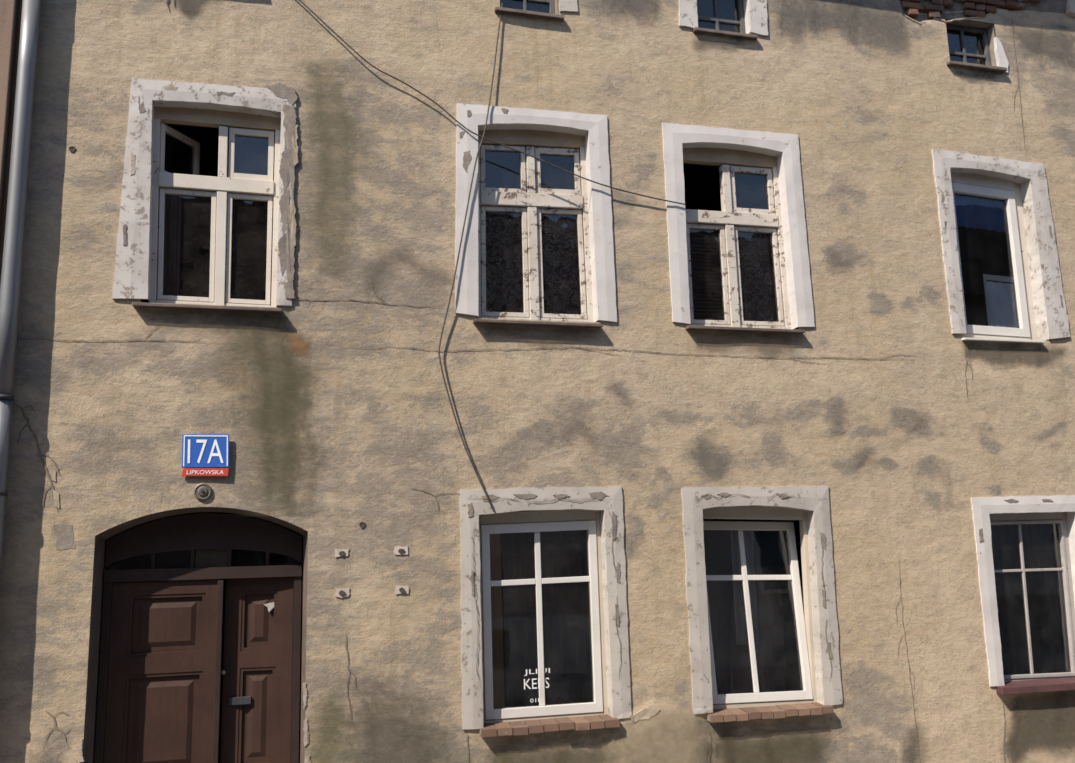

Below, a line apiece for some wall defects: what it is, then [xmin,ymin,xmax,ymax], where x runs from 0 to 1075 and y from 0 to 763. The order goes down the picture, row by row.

flaking render [900,0,1067,25]
flaking render [267,83,298,299]
crack [13,402,60,514]
crack [896,565,920,757]
water stain [1006,691,1075,761]